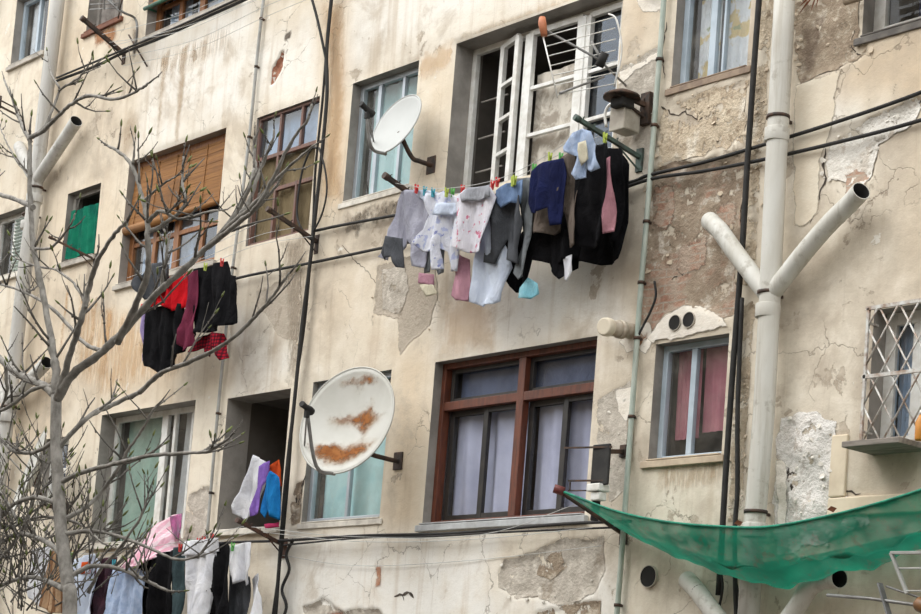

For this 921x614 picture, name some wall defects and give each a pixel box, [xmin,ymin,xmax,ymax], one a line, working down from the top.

spalling [271,51,284,85]
peeling [819,91,921,193]
peeling [371,256,438,355]
spalling [615,0,774,522]
peeling [772,411,837,525]
spalling [302,598,381,614]
peeling [498,536,605,614]